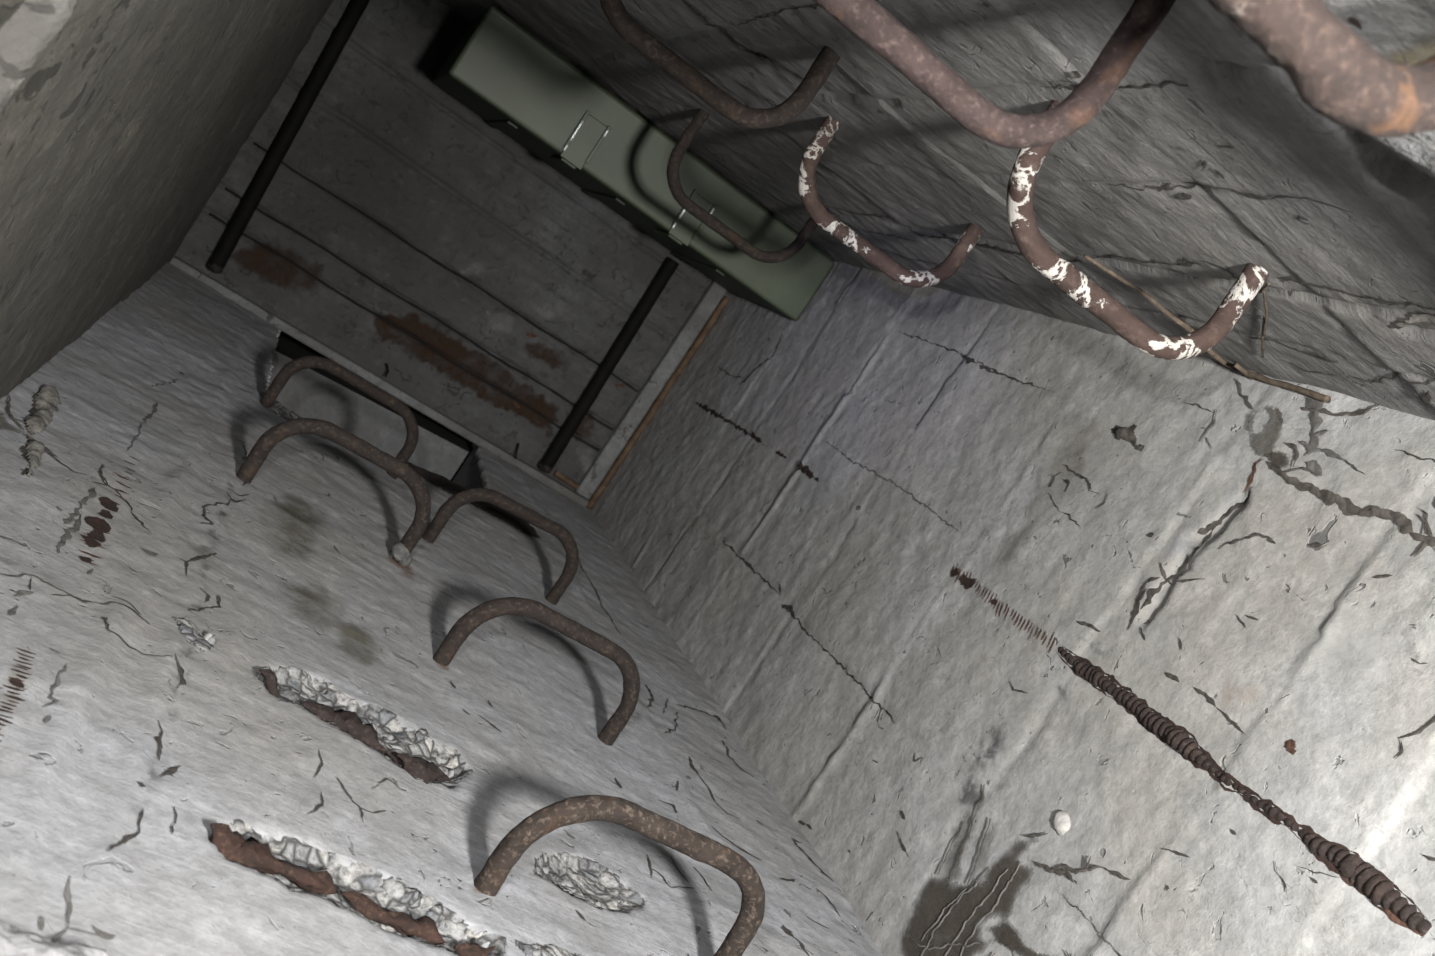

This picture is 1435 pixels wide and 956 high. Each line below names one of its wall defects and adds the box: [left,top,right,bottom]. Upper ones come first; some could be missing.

corrosion [375,314,560,428]
corrosion [79,456,140,566]
crack [0,379,277,688]
crack [1077,486,1322,640]
corrosion [0,648,36,741]
crack [107,720,180,852]
spalling [252,666,473,788]
crack [719,537,895,723]
crack [1165,638,1246,735]
corrosion [1284,739,1296,755]
spalling [208,819,584,956]
spalling [533,852,649,913]